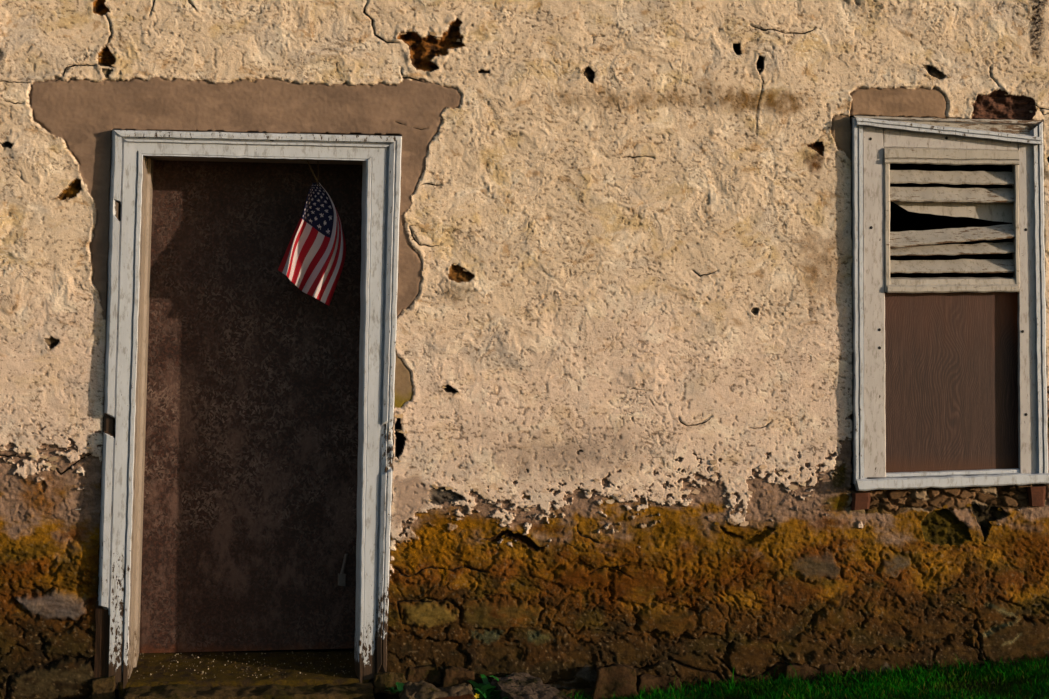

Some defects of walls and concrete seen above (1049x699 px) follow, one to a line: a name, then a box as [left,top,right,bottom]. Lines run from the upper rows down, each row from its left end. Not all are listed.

crack [363,3,396,43]
spalling [398,18,466,72]
spalling [971,89,1039,120]
spalling [55,179,82,201]
spalling [387,386,1049,689]
spalling [0,431,103,699]